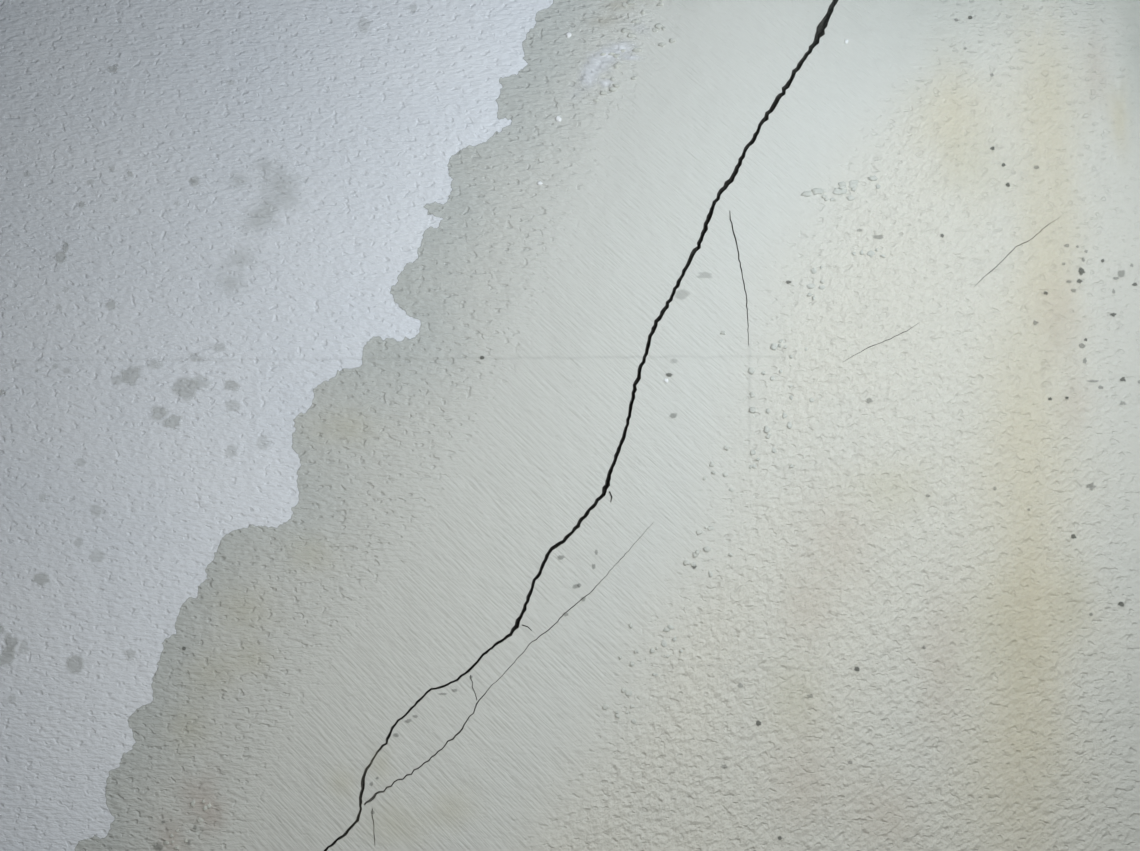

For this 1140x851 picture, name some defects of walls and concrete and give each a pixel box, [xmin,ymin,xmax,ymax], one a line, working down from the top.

peeling [801,175,881,201]
crack [974,217,1060,287]
crack [324,0,838,851]